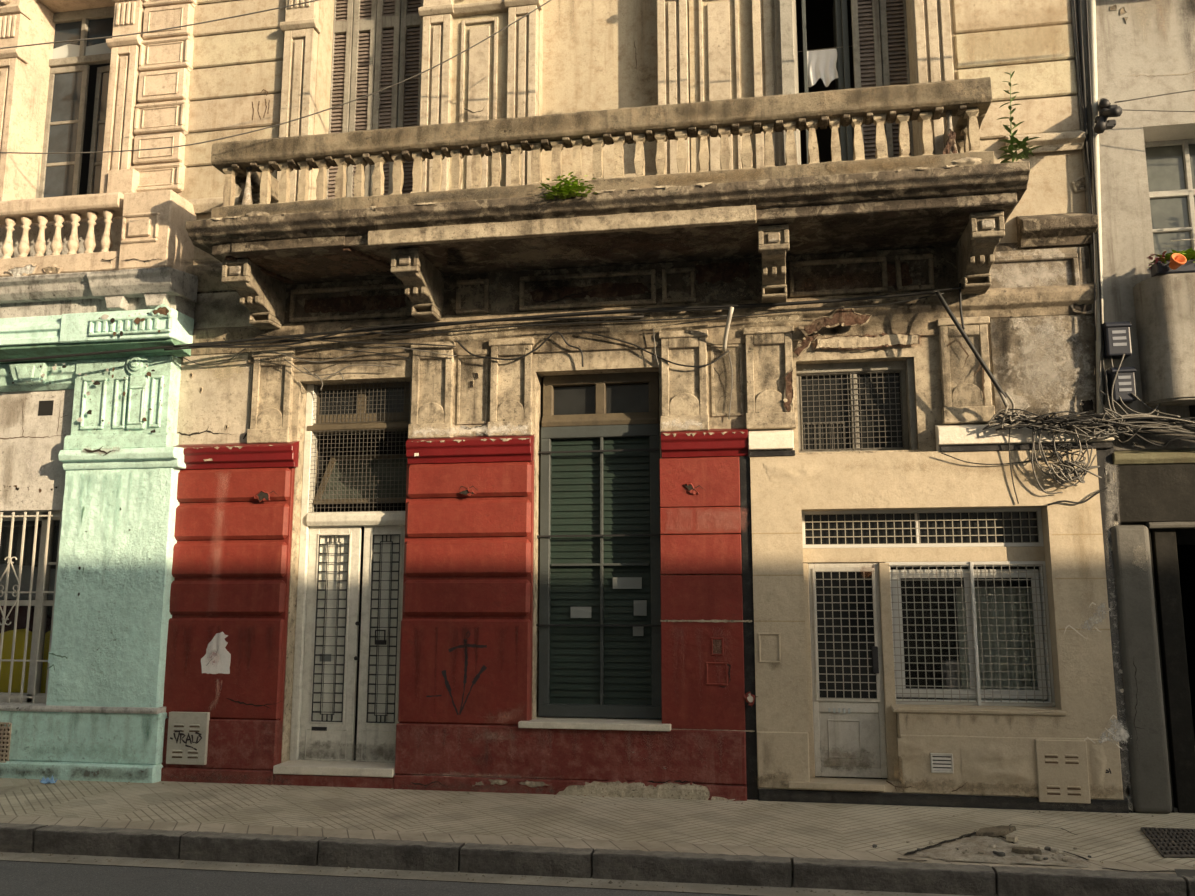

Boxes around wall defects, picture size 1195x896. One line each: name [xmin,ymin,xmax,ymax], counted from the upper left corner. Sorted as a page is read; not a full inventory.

peeling [749,306,920,412]
crack [0,395,117,456]
crack [177,427,247,439]
spalling [485,778,738,801]